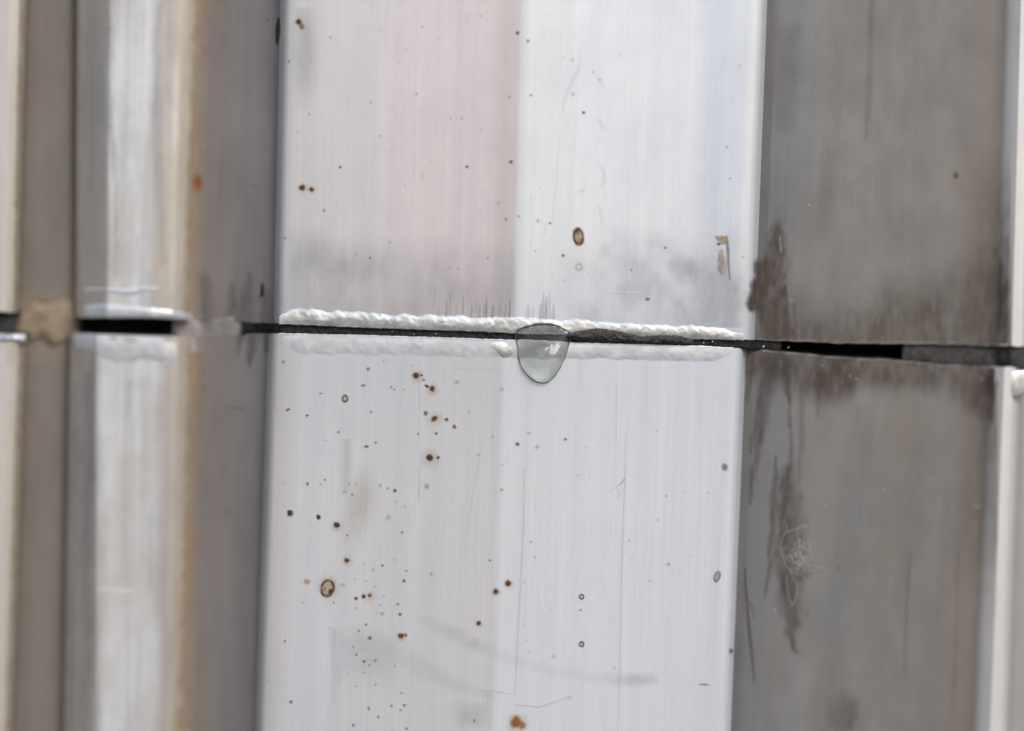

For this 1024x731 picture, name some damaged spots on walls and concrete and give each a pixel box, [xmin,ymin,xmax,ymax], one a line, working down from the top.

rust [573,228,584,245]
water stain [749,226,795,340]
rust [304,579,335,597]
water stain [771,468,801,650]